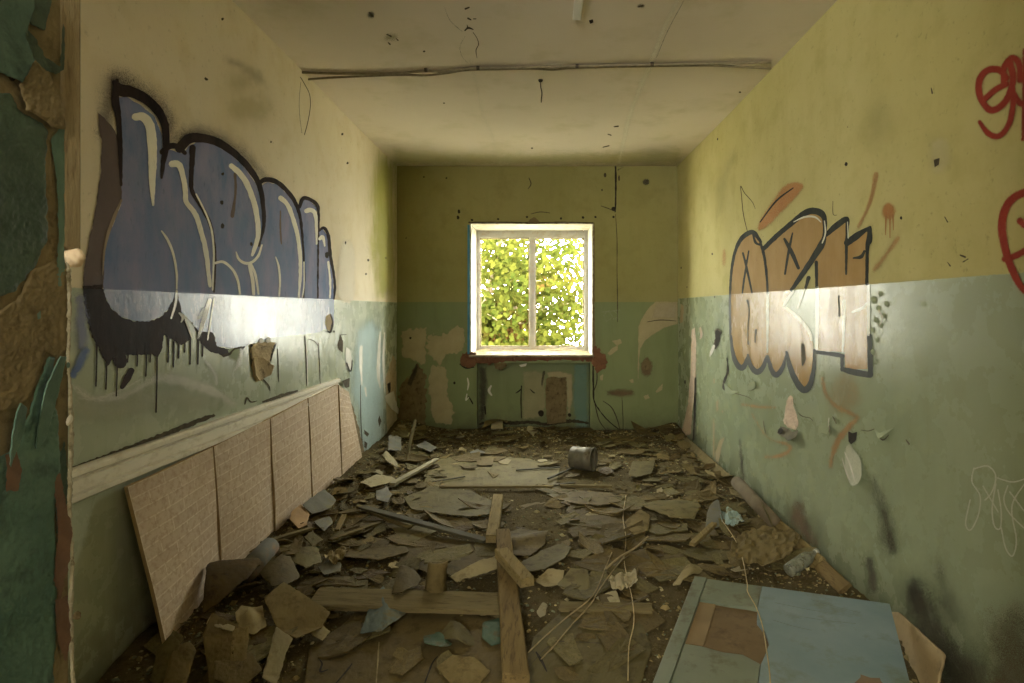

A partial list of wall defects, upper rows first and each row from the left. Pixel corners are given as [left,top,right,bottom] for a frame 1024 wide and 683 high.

peeling [0,0,81,683]
spalling [222,337,277,382]
spalling [401,325,622,425]
peeling [629,301,722,441]
peeling [777,395,836,441]